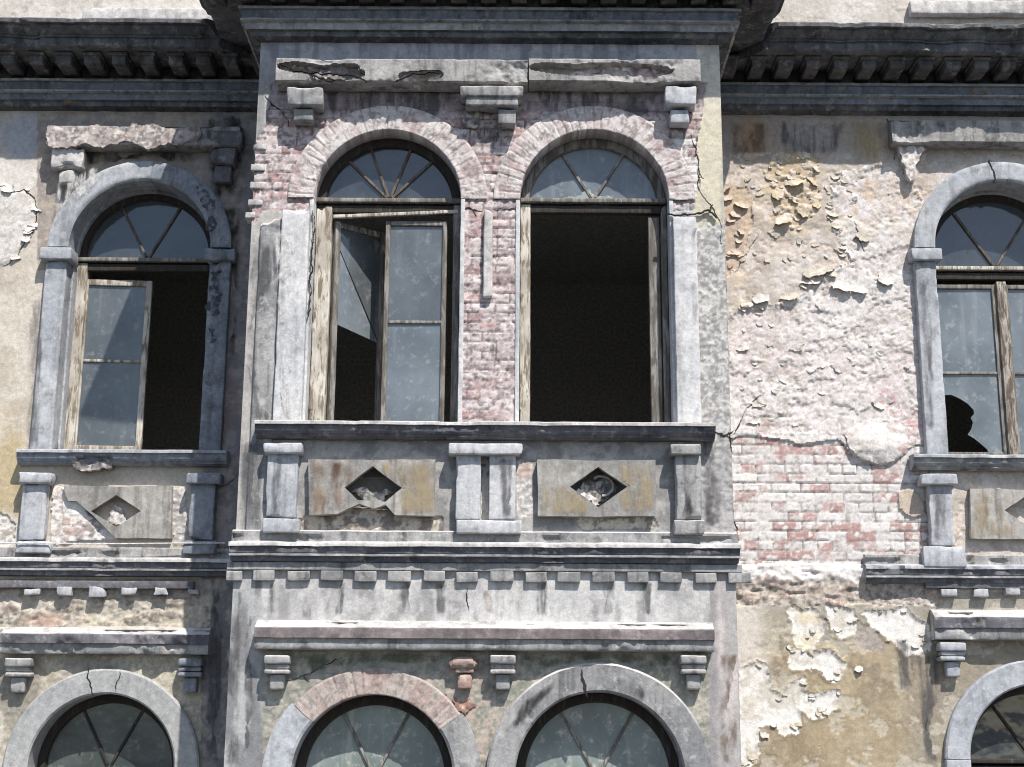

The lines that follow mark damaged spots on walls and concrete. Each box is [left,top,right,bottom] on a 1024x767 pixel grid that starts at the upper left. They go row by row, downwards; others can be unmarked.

flaking render [0,183,42,268]
flaking render [245,65,708,422]
crack [667,135,722,244]
spalling [72,458,114,473]
crack [716,396,759,451]
flaking render [723,145,940,767]
flaking render [51,485,116,545]
crack [580,671,588,697]